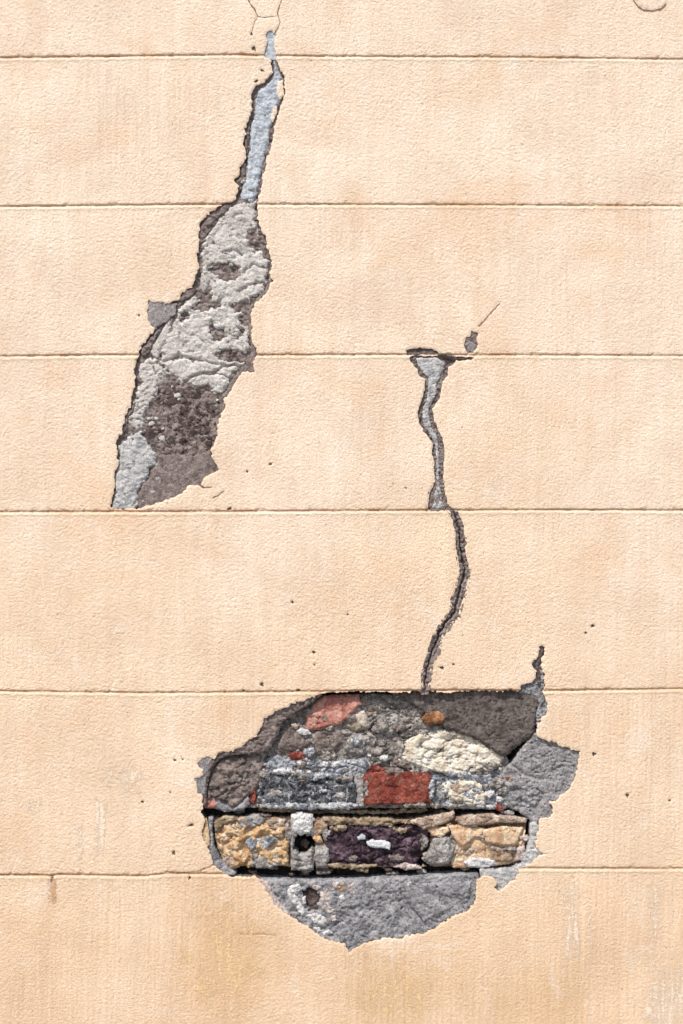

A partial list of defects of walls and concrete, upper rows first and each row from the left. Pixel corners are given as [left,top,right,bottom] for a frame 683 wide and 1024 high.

crack [406,347,474,695]
flaking render [188,646,596,952]